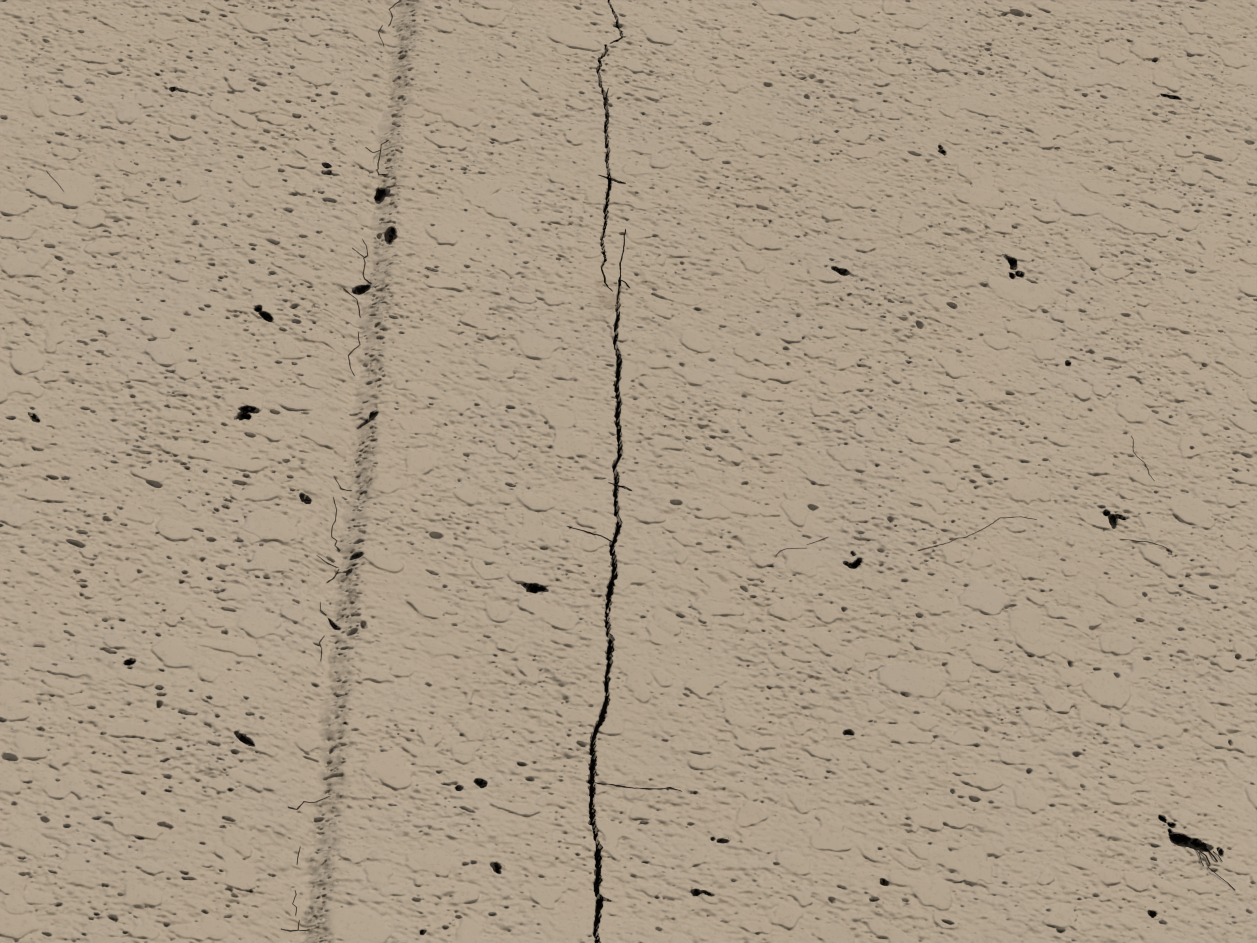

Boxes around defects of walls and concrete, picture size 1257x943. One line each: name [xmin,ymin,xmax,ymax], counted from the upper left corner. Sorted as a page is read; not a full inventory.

crack [568,0,682,943]